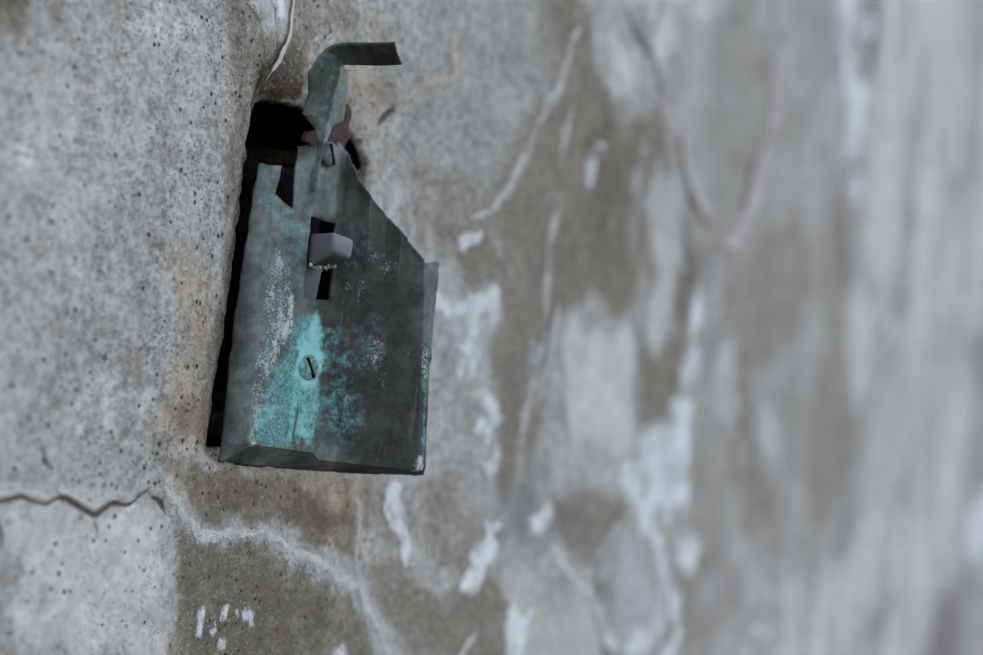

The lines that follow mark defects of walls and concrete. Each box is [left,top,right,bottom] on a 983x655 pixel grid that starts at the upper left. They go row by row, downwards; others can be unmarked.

crack [259,0,295,91]
efflorescence [457,230,483,252]
efflorescence [435,284,506,501]
crack [0,444,167,552]
efflorescence [383,478,411,568]
efflorescence [459,521,502,595]
water stain [195,604,253,655]